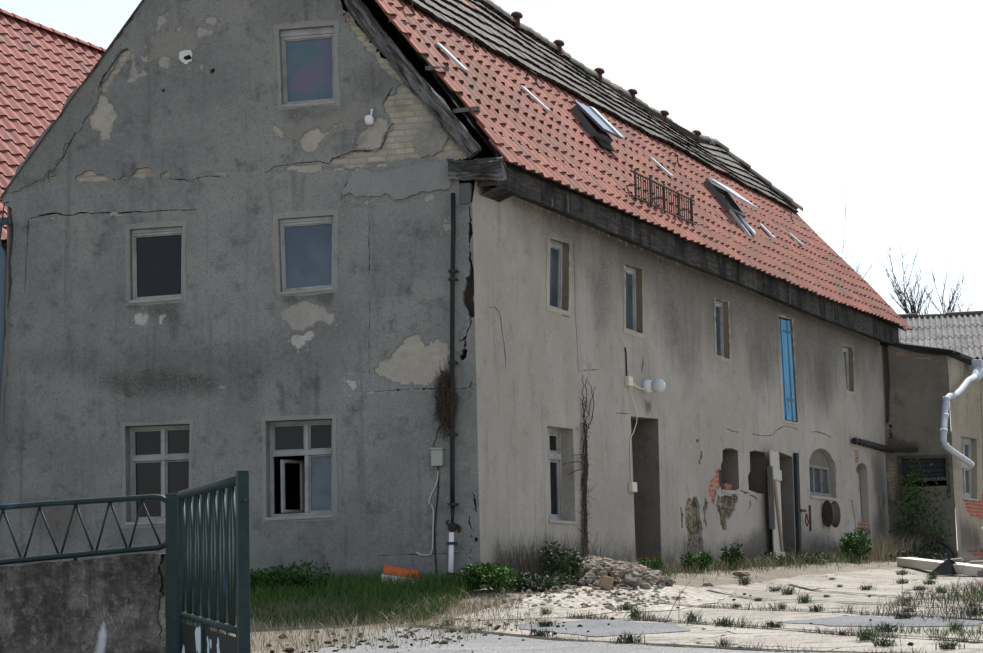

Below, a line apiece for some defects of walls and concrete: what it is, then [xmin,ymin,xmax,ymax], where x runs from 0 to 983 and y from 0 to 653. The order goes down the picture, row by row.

flaking render [87,9,222,145]
flaking render [267,12,466,178]
flaking render [279,296,338,352]
flaking render [373,327,450,390]
crack [464,219,475,339]
flaking render [685,470,736,556]